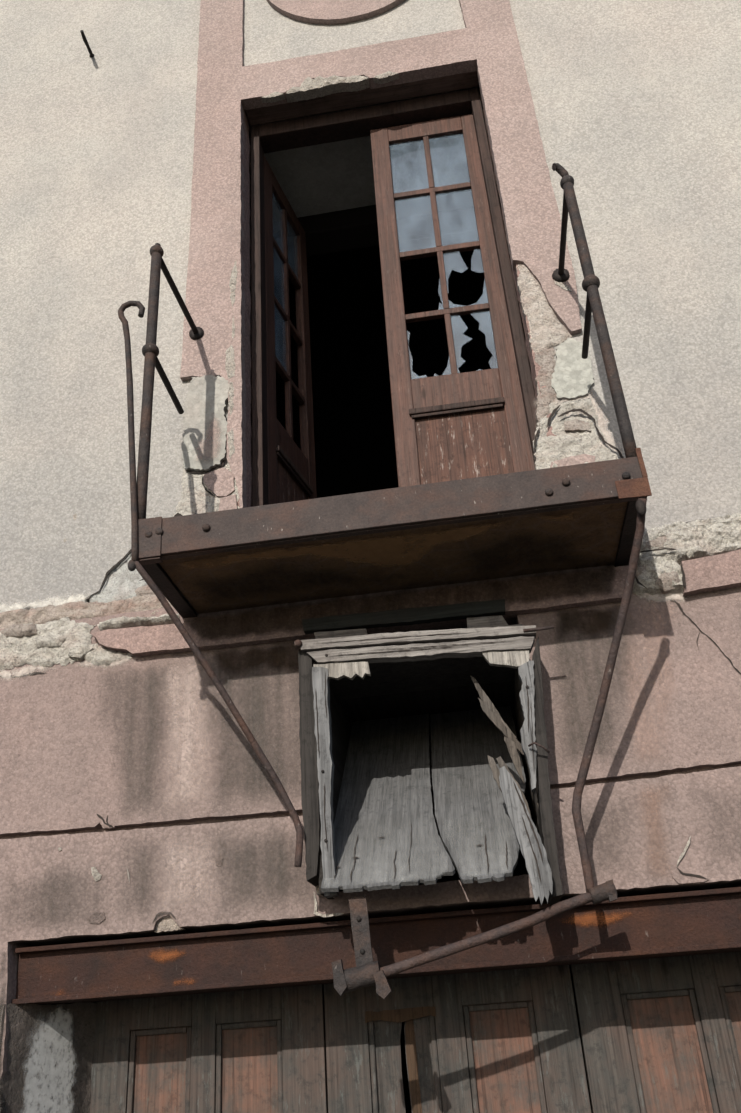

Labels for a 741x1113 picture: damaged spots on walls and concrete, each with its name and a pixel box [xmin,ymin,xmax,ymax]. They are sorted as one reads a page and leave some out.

flaking render [173,260,240,517]
spalling [516,264,624,470]
spalling [632,513,741,601]
spalling [0,549,180,678]
crack [667,598,741,674]
water stain [169,672,196,794]
rust [151,951,182,961]
rust [567,913,620,925]
peeling [23,1008,75,1113]